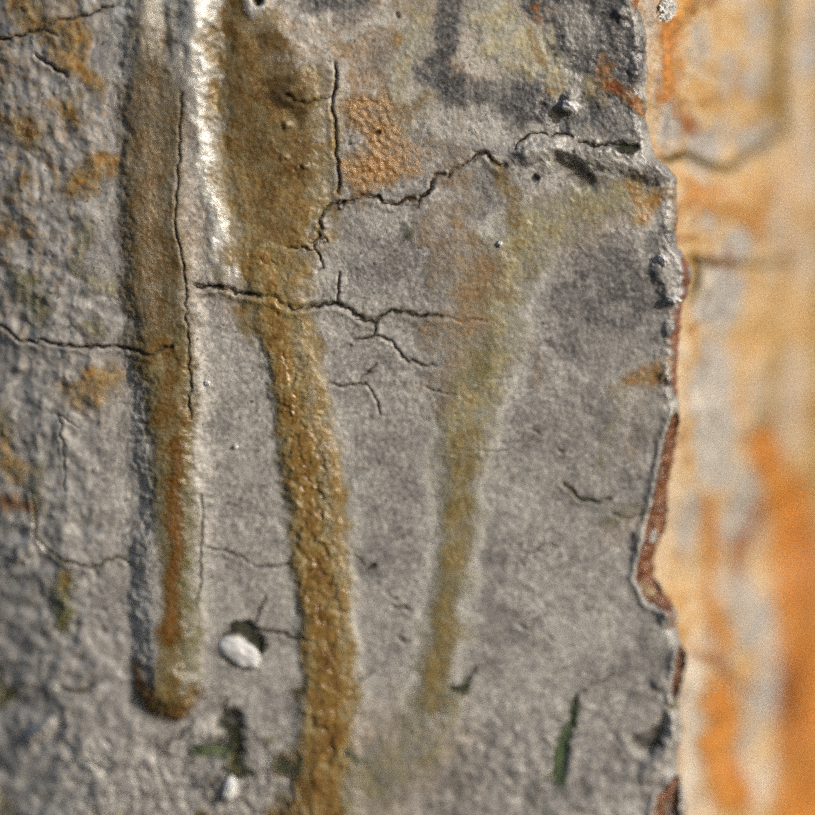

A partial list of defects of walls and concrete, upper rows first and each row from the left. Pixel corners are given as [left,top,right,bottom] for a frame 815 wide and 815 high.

crack [0,7,111,40]
corrosion [6,0,106,92]
corrosion [66,150,122,198]
crack [0,66,634,418]
corrosion [415,203,507,413]
corrosion [202,0,473,815]
crack [196,495,294,603]
water stain [339,180,637,815]
spalling [636,413,679,610]
spalling [218,637,262,670]
spalling [667,645,686,710]
spalling [654,776,680,815]